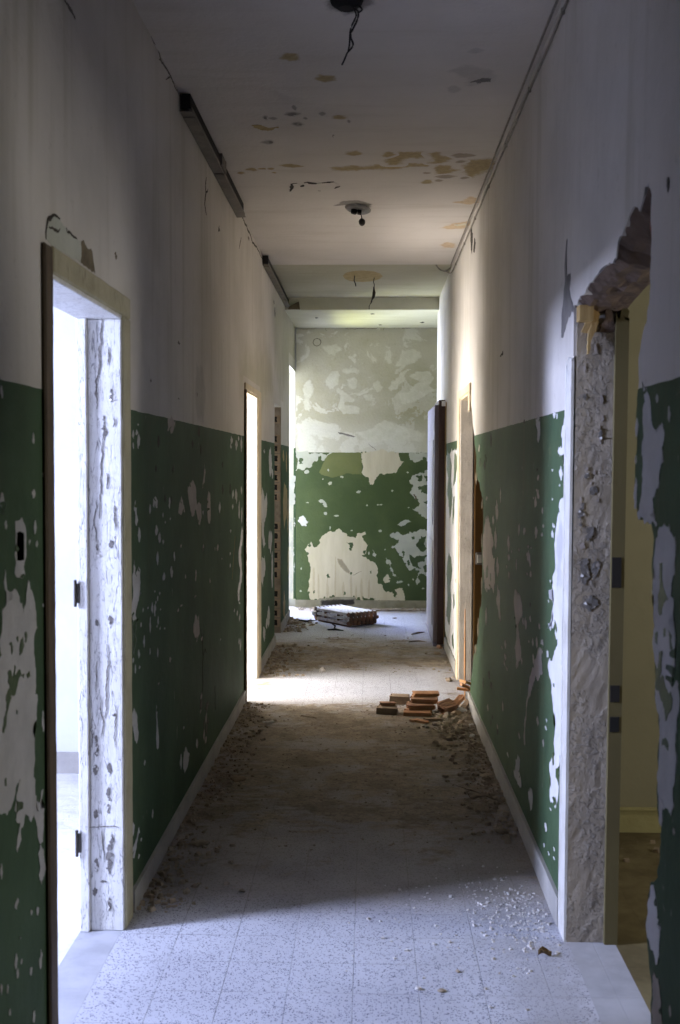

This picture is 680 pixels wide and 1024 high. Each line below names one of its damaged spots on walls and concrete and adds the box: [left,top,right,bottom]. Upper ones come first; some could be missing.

flaking render [47,217,95,273]
crack [290,182,340,192]
leakage [324,149,498,185]
peeling [0,492,46,885]
peeling [132,464,243,673]
peeling [261,340,457,679]
peeling [474,412,564,811]
peeling [634,382,680,835]
spalling [0,950,43,995]
peeling [646,876,671,1024]